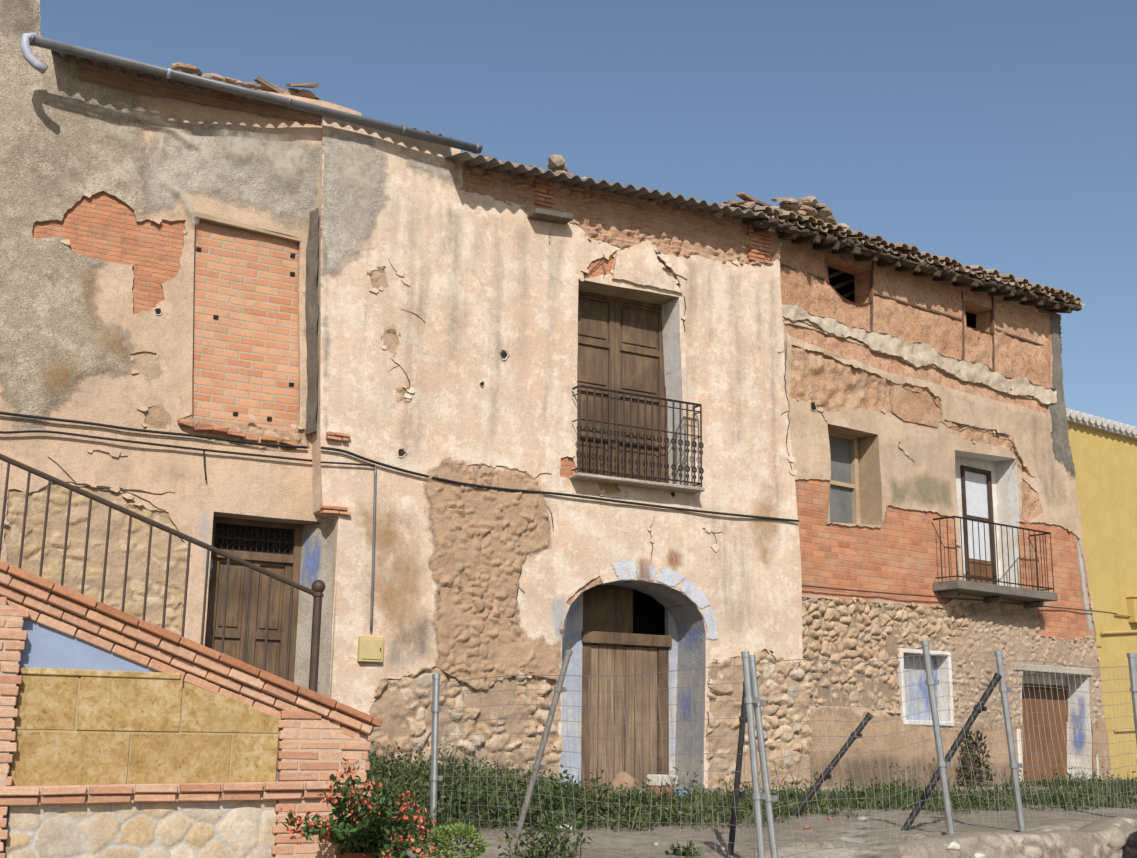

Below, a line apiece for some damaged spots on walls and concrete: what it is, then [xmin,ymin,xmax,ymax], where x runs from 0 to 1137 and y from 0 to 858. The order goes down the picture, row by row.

flaking render [0,0,322,427]
flaking render [460,154,782,285]
flaking render [4,483,193,639]
crack [87,449,128,457]
crack [48,457,175,511]
flaking render [424,458,564,691]
crack [778,320,866,475]
crack [899,442,915,462]
flaking render [783,317,1097,642]
crack [944,423,1034,477]